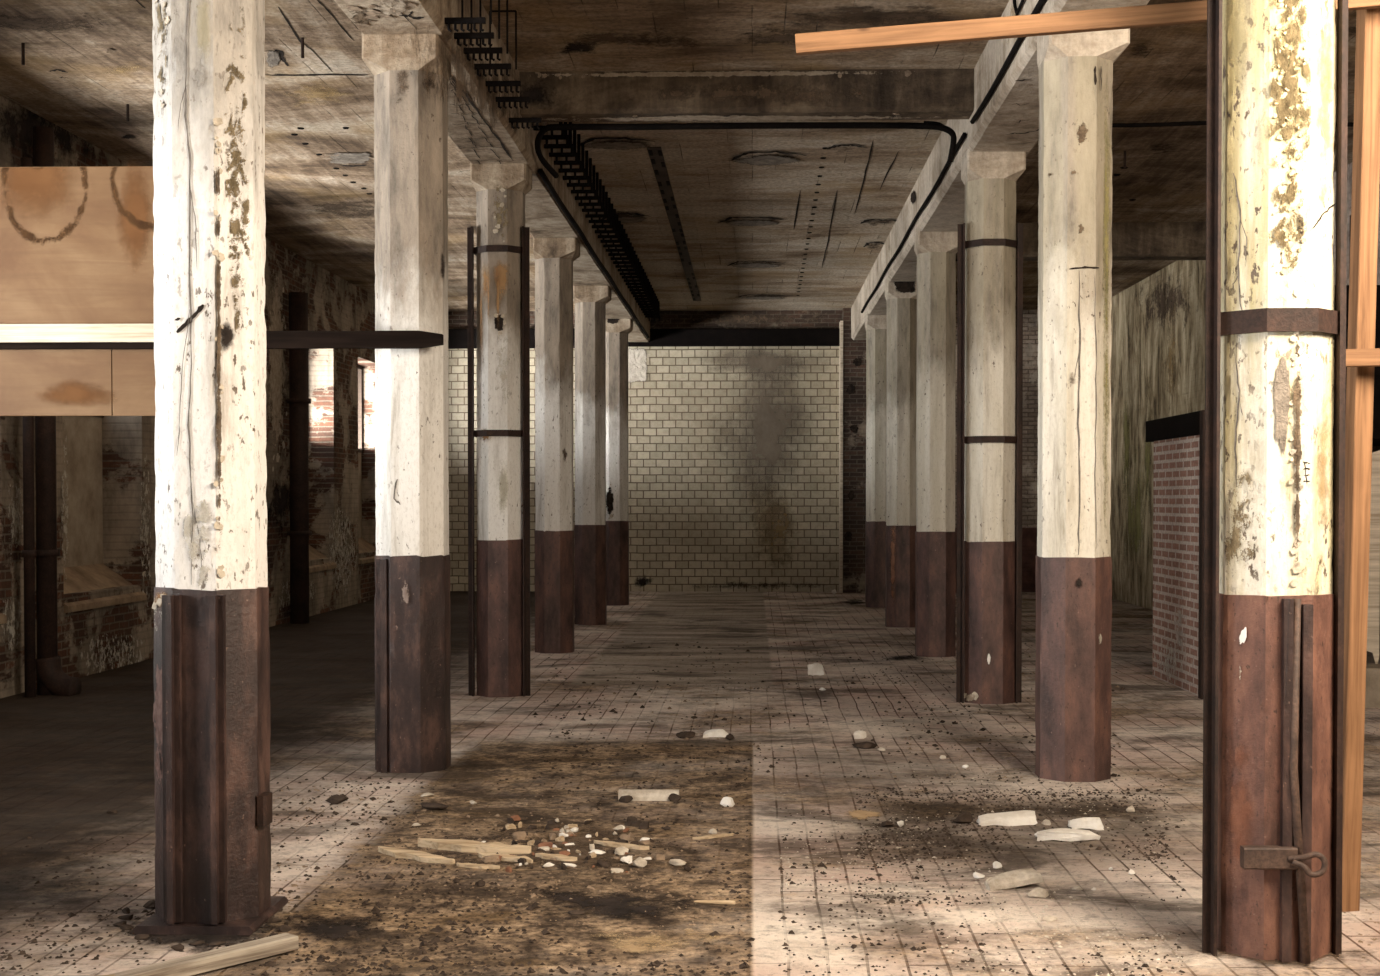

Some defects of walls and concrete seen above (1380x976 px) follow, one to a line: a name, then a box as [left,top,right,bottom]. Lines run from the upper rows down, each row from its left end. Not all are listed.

peeling [1268,0,1311,297]
peeling [175,55,250,586]
peeling [1,598,24,651]
damp [725,351,802,563]
peeling [1224,471,1260,573]
spalling [1274,331,1305,587]